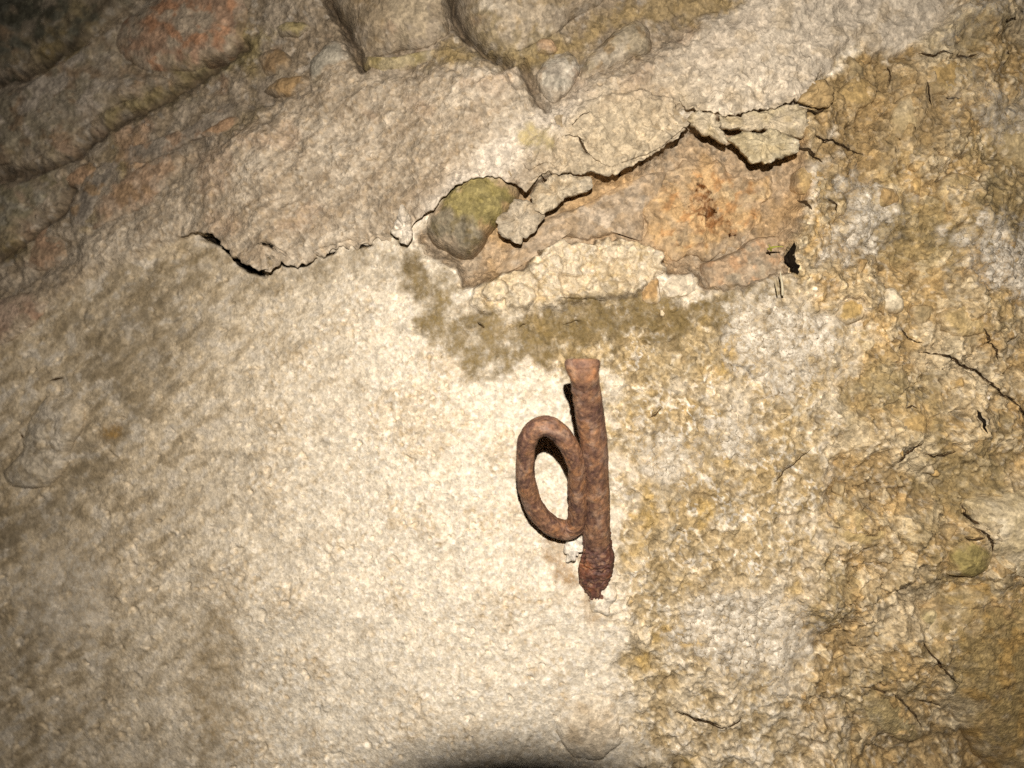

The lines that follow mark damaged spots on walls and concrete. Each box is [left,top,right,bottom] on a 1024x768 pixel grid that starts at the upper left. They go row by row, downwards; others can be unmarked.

crack [799,108,863,162]
spalling [390,79,836,297]
crack [797,197,838,213]
crack [200,236,371,275]
crack [784,243,800,274]
crack [902,329,1024,433]
crack [897,444,957,463]
crack [675,712,742,729]